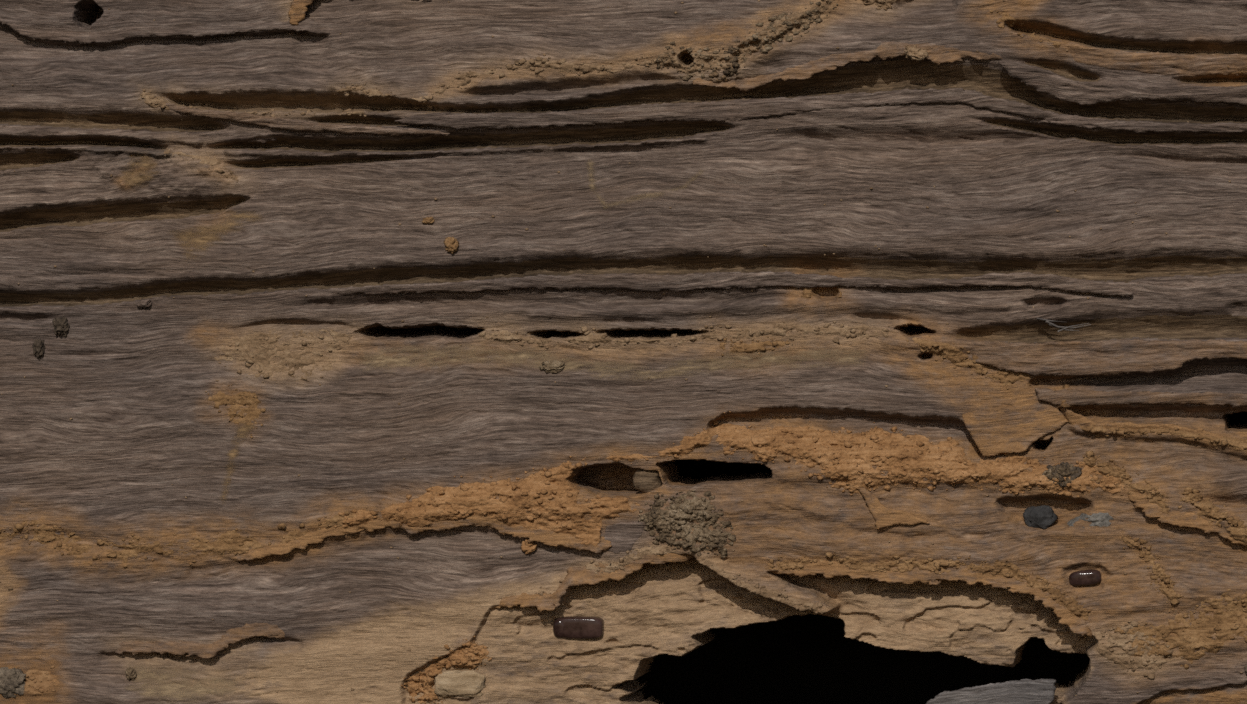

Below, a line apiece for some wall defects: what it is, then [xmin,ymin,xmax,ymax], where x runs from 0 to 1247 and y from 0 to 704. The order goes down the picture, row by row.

crack [0,59,1247,170]
crack [64,270,125,278]
crack [548,285,585,293]
crack [607,318,651,326]
peeling [962,390,1247,478]
peeling [859,488,930,529]
peeling [1128,492,1247,546]
spalling [402,553,1099,704]